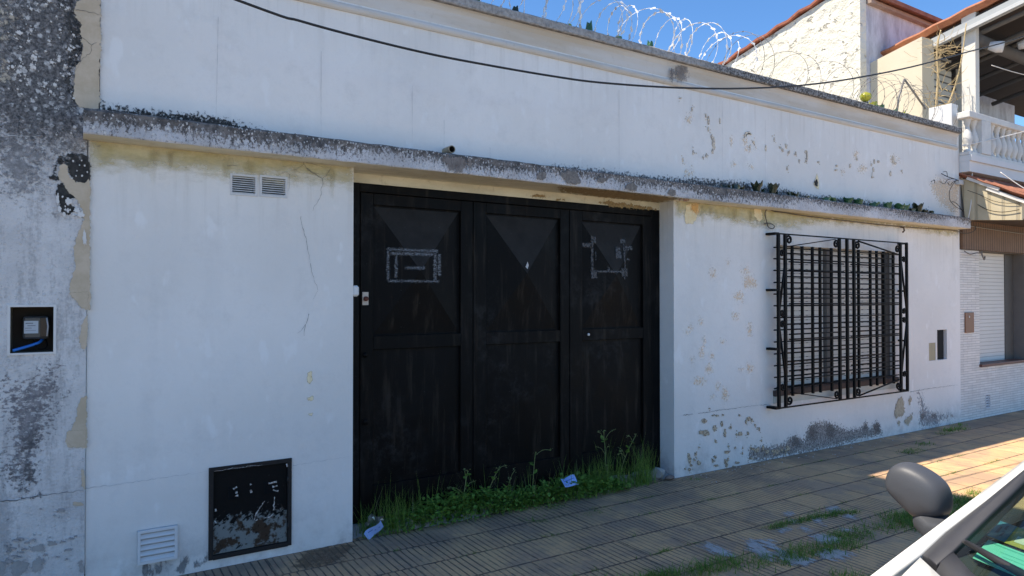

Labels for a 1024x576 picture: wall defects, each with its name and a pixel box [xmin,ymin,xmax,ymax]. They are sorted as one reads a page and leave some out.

leakage [57,0,83,104]
leakage [670,65,689,82]
peeling [731,131,820,189]
spalling [532,171,699,224]
flaking render [58,164,91,351]
crack [282,133,331,333]
leakage [0,363,71,499]
flaking render [65,396,88,448]
peeling [684,408,761,472]
leakage [725,420,883,467]
peeling [894,396,913,426]
leakage [917,392,953,427]